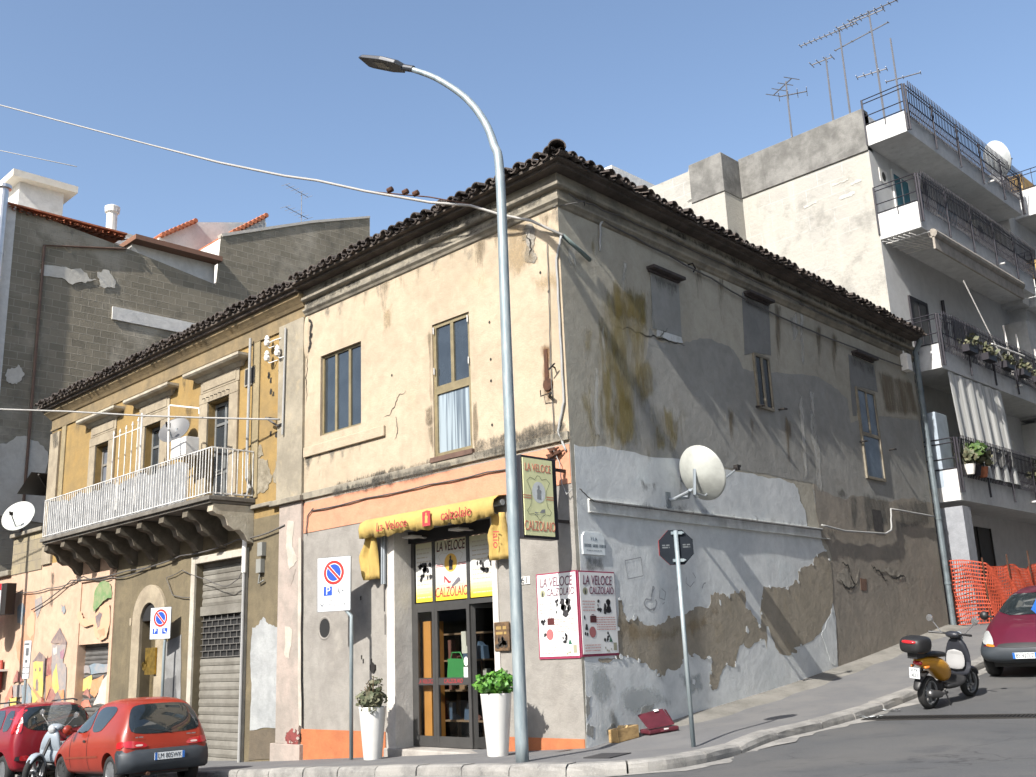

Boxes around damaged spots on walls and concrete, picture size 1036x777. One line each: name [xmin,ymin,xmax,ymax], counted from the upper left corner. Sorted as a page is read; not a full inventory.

peeling [40,265,116,288]
peeling [5,365,24,384]
peeling [0,436,48,523]
peeling [598,551,905,690]